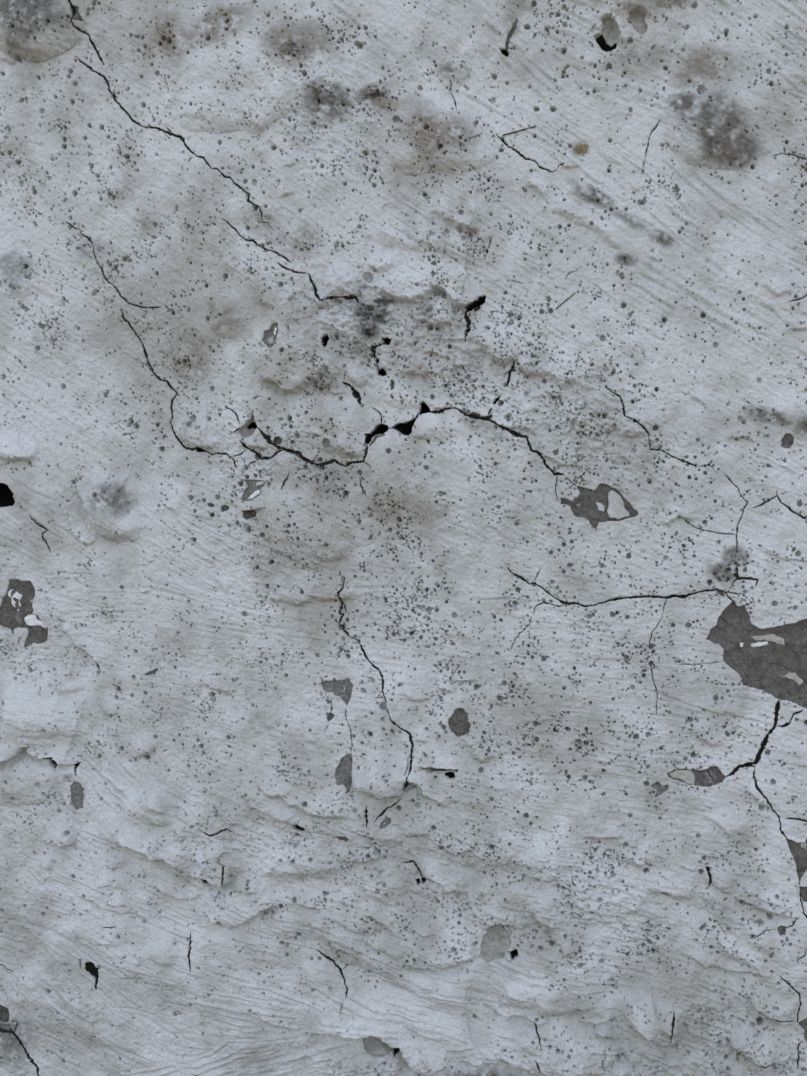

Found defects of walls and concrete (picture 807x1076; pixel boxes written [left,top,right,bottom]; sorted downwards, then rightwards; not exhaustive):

crack [68,0,359,303]
crack [469,129,564,172]
crack [66,222,371,497]
crack [343,372,577,500]
spalling [0,579,48,648]
crack [337,577,414,828]
spalling [448,708,471,737]
spalling [561,484,638,529]
crack [507,388,807,712]
spalling [706,602,807,708]
crack [724,700,807,838]
spalling [786,838,807,902]